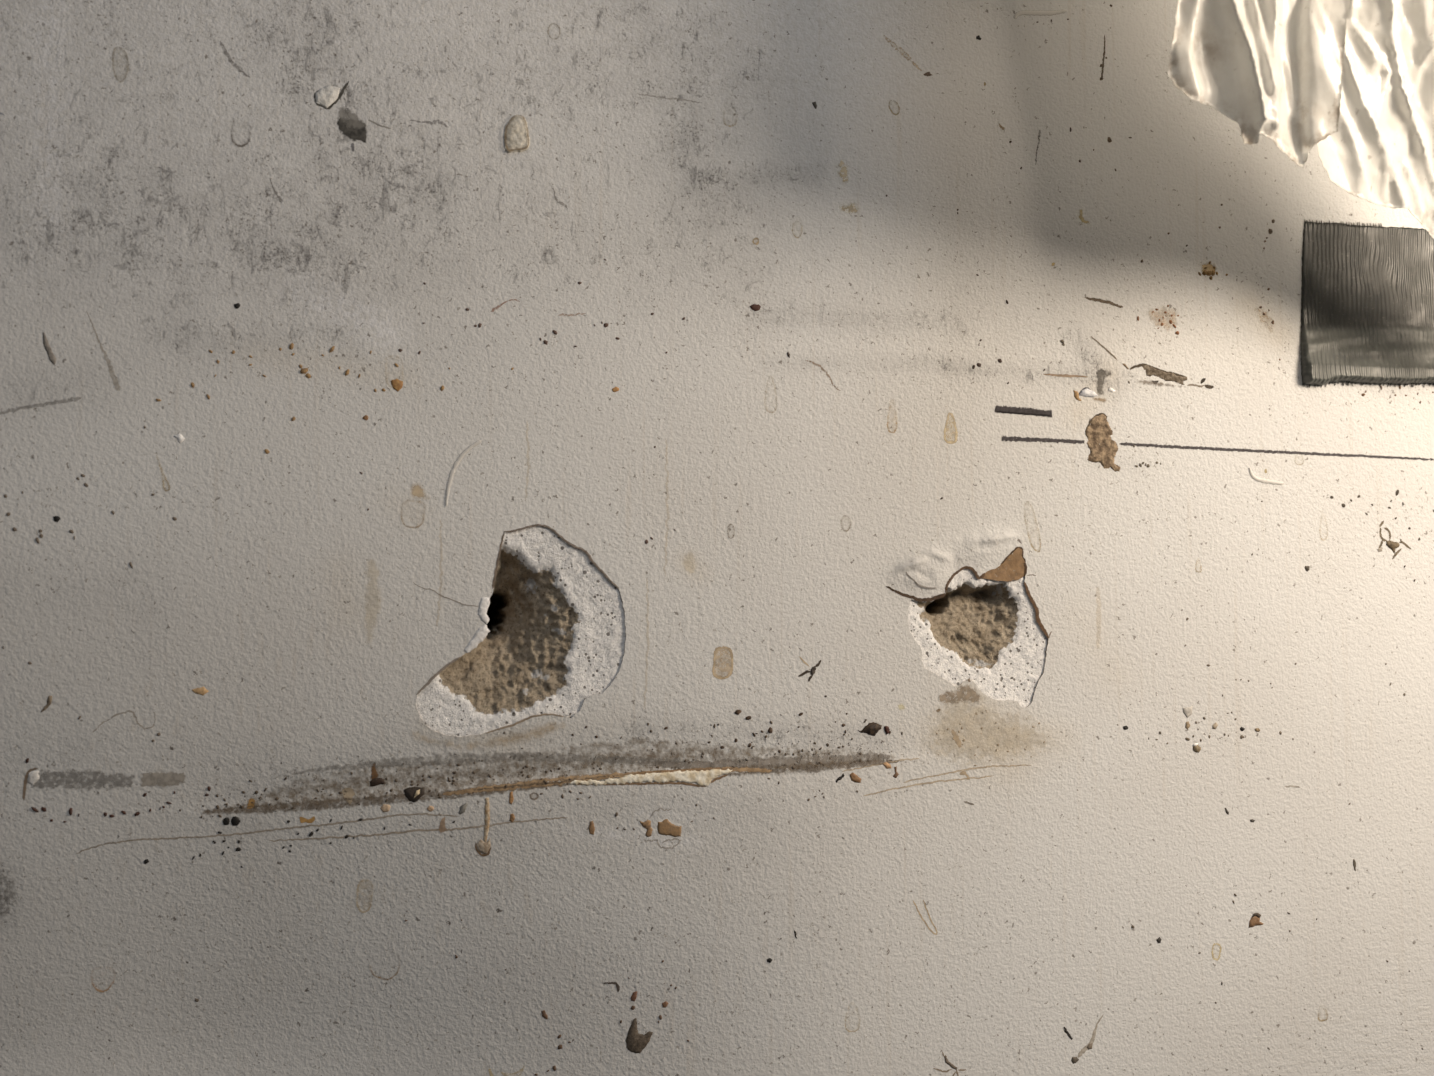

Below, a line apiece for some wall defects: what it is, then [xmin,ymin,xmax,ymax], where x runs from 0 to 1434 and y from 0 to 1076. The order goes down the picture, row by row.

flaking render [413,524,626,737]
flaking render [886,539,1052,708]